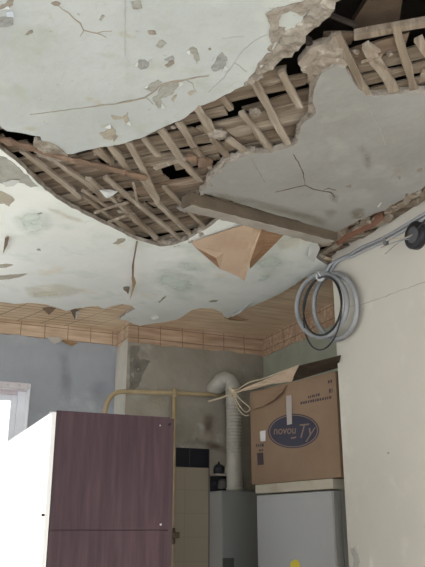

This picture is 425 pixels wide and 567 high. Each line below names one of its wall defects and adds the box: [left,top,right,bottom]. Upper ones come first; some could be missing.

crack [59,6,110,38]
flaking render [134,59,152,70]
crack [30,34,267,115]
flaking render [145,80,184,110]
flaking render [211,52,228,72]
flaking render [100,113,131,141]
peeling [0,156,38,207]
crack [277,156,335,197]
spalling [307,187,425,269]
peeling [0,241,138,332]
peeling [149,277,334,338]
peeling [129,345,151,389]